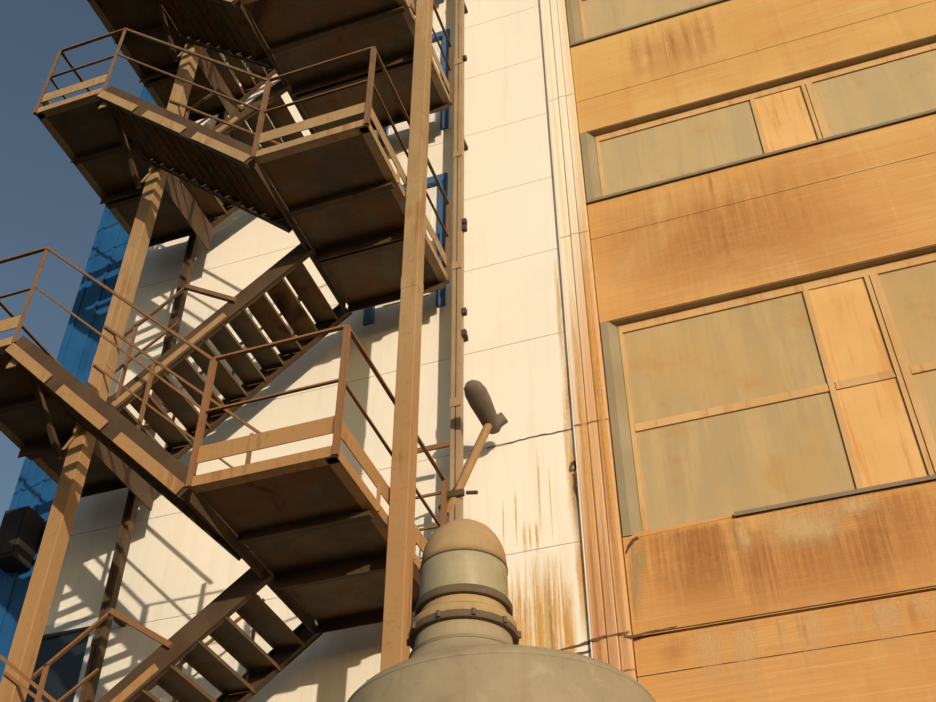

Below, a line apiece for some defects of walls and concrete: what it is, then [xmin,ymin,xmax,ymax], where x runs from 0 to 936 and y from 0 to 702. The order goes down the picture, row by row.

crack [486,418,607,449]
water stain [772,495,871,540]
rust [516,579,575,653]